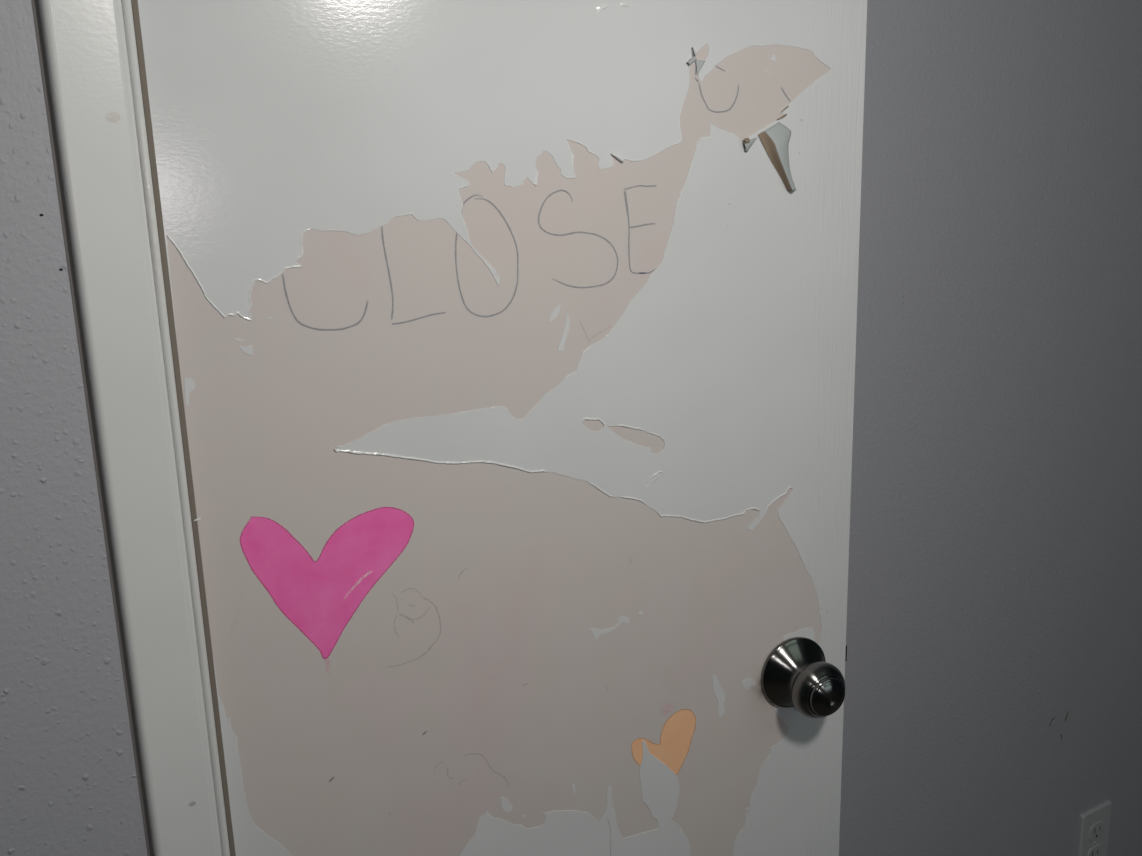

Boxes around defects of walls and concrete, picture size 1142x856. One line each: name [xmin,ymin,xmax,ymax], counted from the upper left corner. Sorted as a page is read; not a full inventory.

peeling [165,44,832,856]